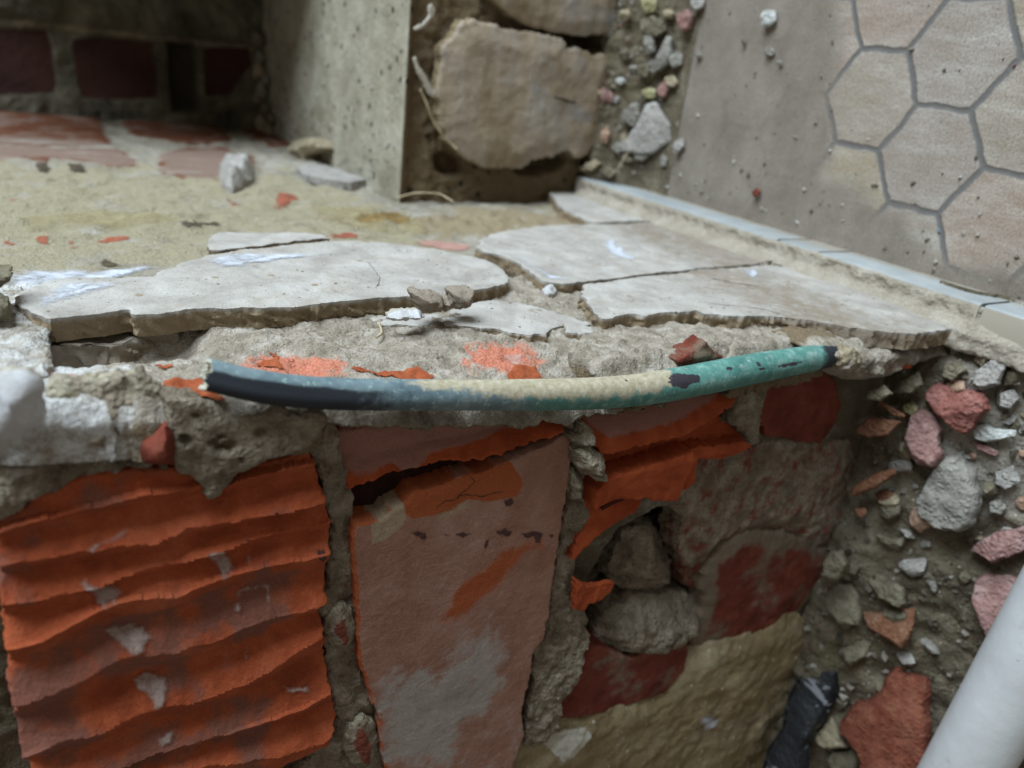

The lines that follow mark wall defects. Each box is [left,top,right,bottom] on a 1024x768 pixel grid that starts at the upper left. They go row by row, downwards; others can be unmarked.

crack [594,261,779,314]
spalling [0,321,946,768]